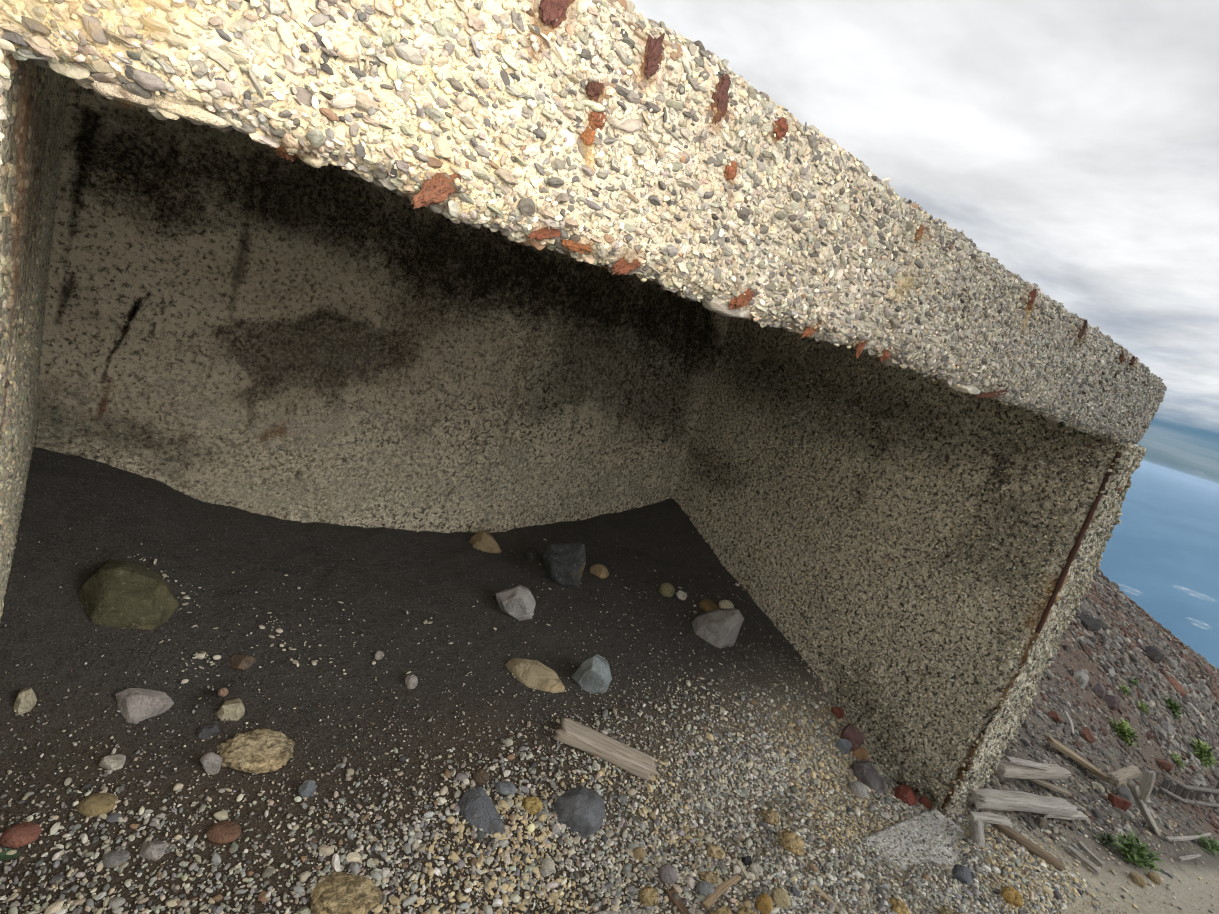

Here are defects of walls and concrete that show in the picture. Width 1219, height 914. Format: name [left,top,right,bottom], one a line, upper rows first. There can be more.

rust [538,0,575,29]
rust [641,33,665,80]
rust [580,79,607,146]
rust [710,73,731,127]
rust [772,117,788,140]
rust [724,161,738,180]
rust [411,173,461,209]
rust [527,227,592,254]
damp [0,65,945,460]
rust [611,257,645,275]
rust [729,288,758,310]
crack [98,294,150,418]